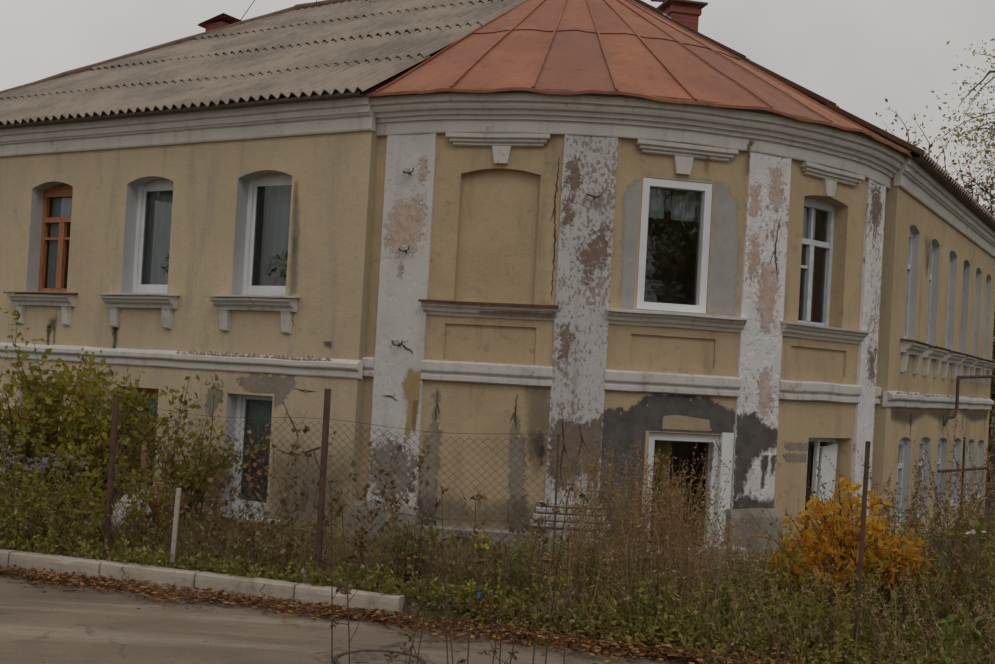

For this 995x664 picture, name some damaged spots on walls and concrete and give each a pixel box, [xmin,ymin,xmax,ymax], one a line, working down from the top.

peeling [383,155,431,277]
peeling [560,157,586,226]
peeling [748,162,787,217]
peeling [570,217,614,290]
peeling [745,230,781,340]
peeling [176,350,331,361]
flaking render [236,373,296,406]
peeling [557,323,576,362]
flaking render [546,413,604,492]
flaking render [733,366,778,509]